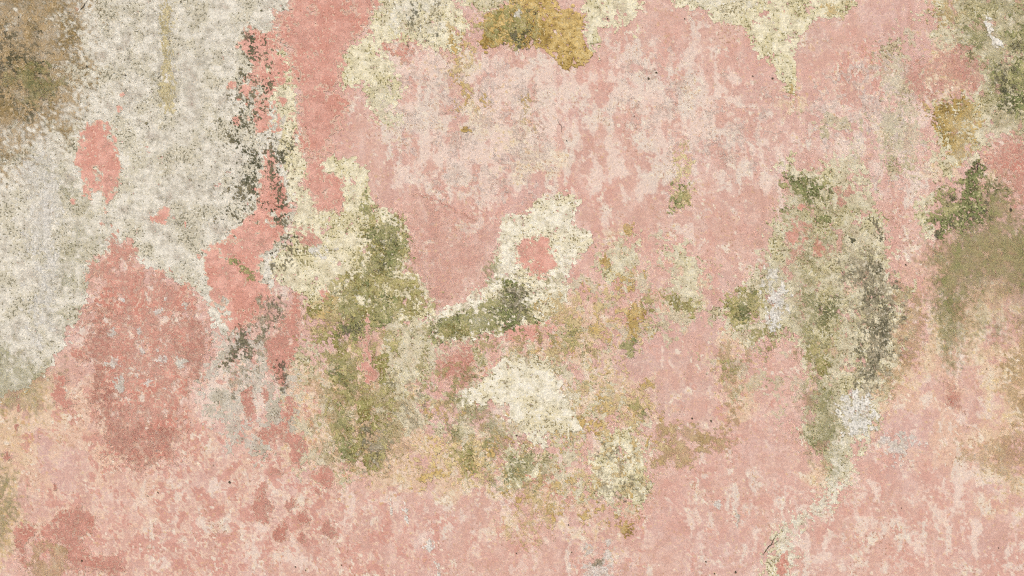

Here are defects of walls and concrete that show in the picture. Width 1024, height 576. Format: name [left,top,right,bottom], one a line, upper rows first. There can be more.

peeling [0,0,33,59]
peeling [580,0,645,60]
peeling [671,0,858,101]
peeling [429,69,569,180]
leakage [0,0,98,373]
leakage [760,263,793,333]
leakage [831,217,928,468]